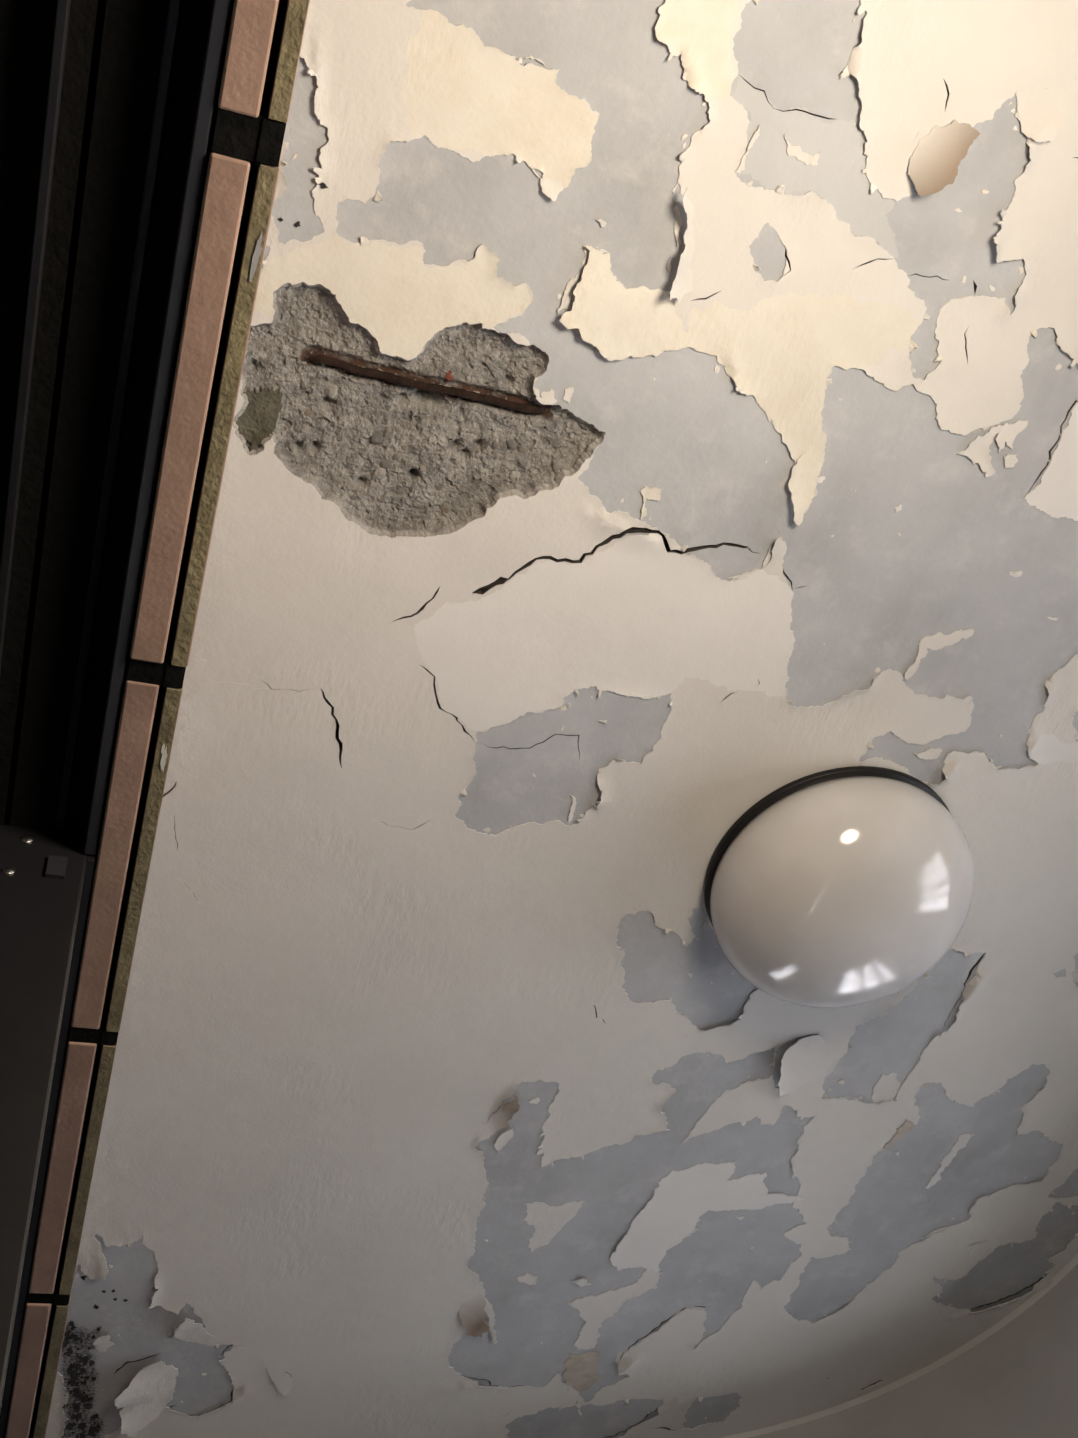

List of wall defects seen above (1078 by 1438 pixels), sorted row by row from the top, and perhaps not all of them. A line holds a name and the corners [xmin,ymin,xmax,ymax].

peeling [232,0,1078,785]
crack [394,527,805,621]
crack [264,682,343,768]
peeling [455,686,672,835]
peeling [616,907,758,1031]
peeling [447,949,1078,1438]
damp [62,1320,104,1438]
peeling [58,1234,234,1438]